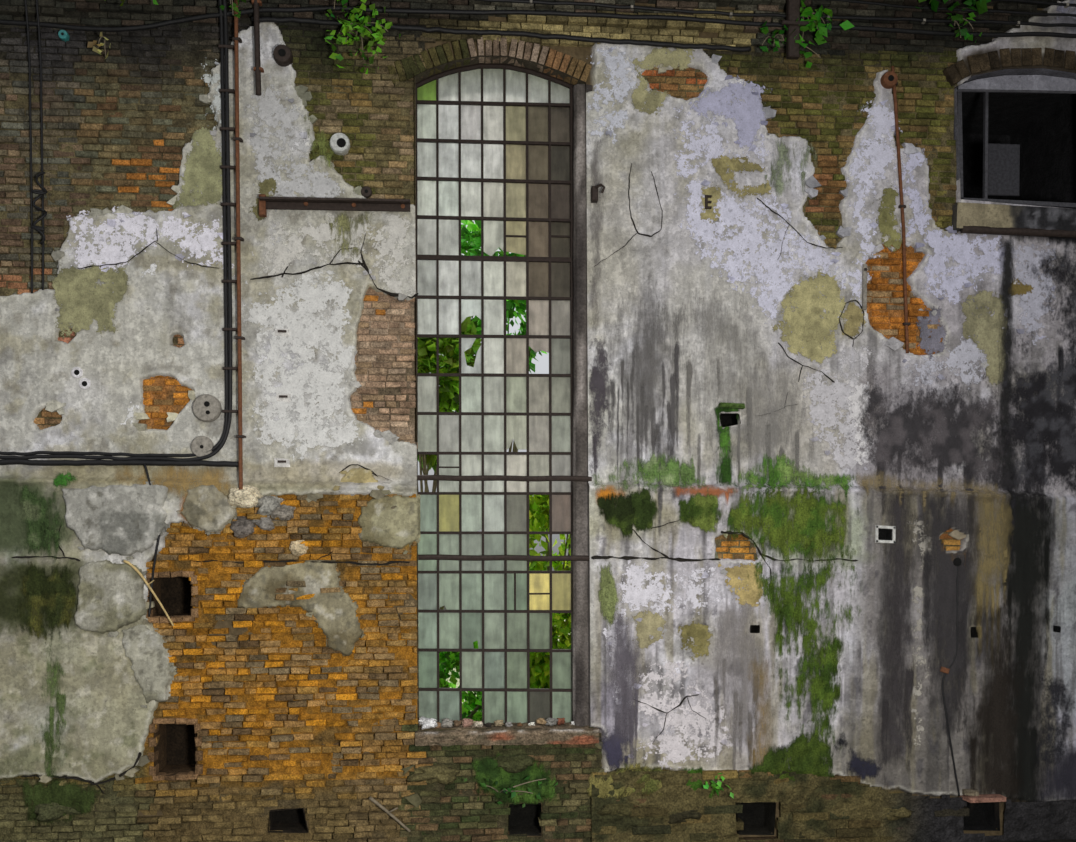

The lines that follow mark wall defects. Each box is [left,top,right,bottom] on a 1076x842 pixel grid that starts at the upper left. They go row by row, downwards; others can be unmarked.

spalling [0,4,254,343]
crack [78,228,216,269]
crack [250,234,418,298]
spalling [242,15,436,462]
crack [595,163,663,266]
spalling [587,34,1063,471]
leakage [589,302,701,524]
leakage [763,235,1076,806]
spalling [0,489,614,842]
leakage [602,617,639,772]
crack [634,694,705,744]
leakage [714,606,759,770]